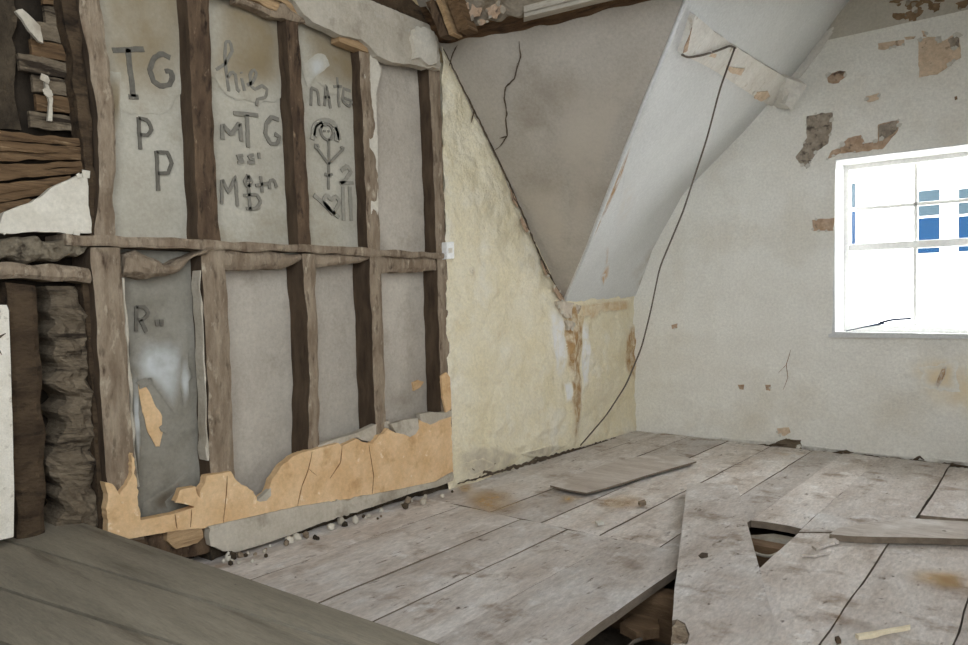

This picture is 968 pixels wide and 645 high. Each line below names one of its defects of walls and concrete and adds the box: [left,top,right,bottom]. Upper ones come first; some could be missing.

peeling [889,0,968,21]
peeling [878,31,963,77]
spalling [229,0,440,215]
peeling [796,112,902,169]
crack [443,44,563,297]
peeling [811,218,835,232]
peeling [100,372,454,552]